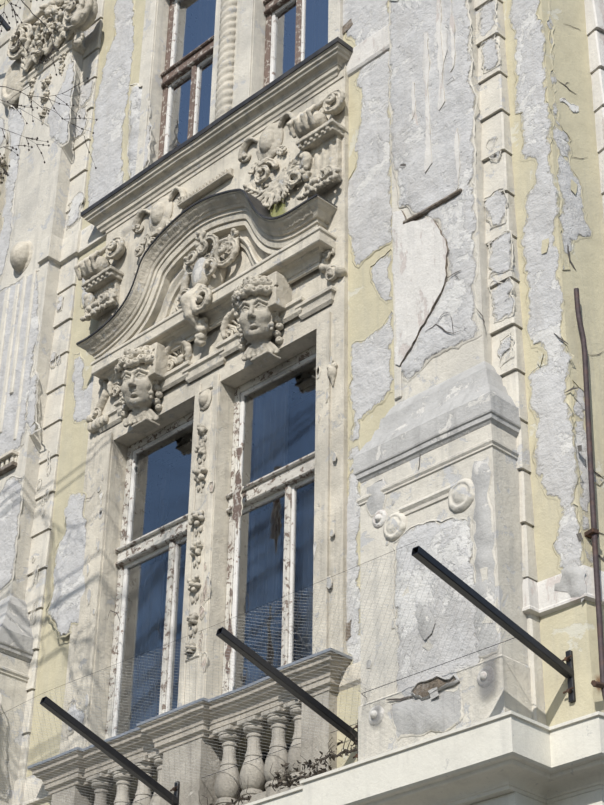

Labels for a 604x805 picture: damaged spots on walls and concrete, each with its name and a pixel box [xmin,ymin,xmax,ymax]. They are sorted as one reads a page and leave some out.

spalling [46,0,152,230]
crack [425,312,458,334]
spalling [342,0,604,668]
spalling [0,475,23,592]
spalling [46,491,100,639]
peeling [224,645,232,679]
peeling [231,446,244,535]
spalling [385,455,501,741]